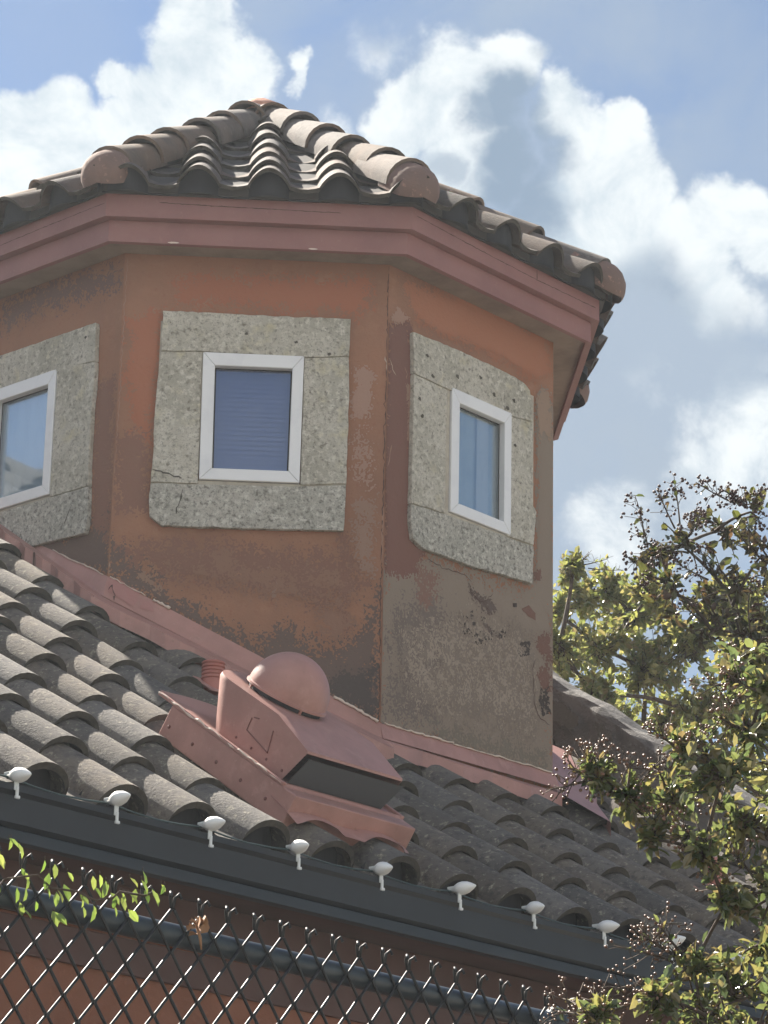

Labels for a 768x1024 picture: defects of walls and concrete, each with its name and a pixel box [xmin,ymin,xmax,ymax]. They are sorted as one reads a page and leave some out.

crack [153,469,183,513]
water stain [43,316,579,771]
peeling [380,385,553,771]